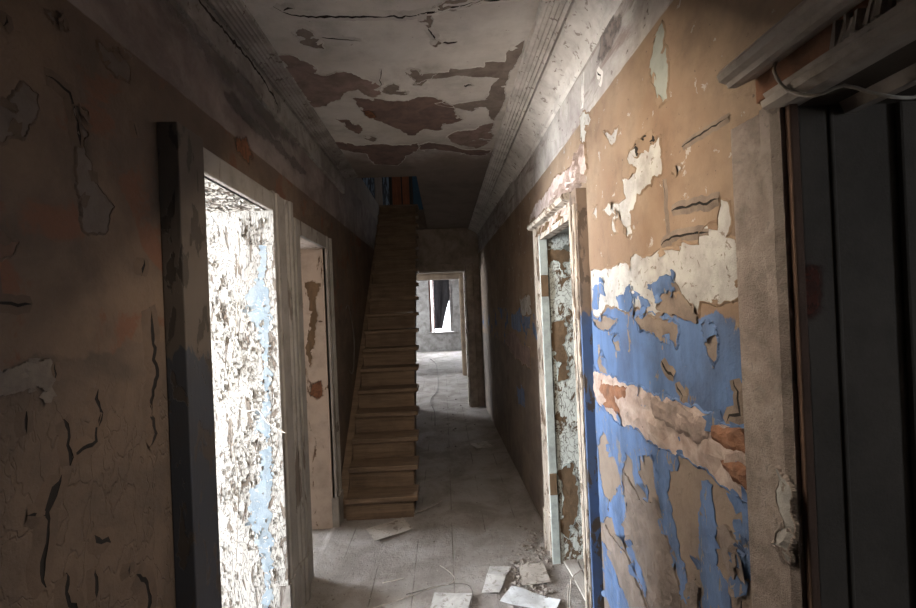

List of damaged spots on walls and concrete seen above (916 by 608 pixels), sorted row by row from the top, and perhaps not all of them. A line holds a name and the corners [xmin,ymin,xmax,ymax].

peeling [290,27,326,50]
crack [270,0,523,46]
peeling [278,39,525,166]
spalling [529,109,592,223]
peeling [603,125,620,147]
peeling [592,129,683,239]
peeling [547,244,570,278]
peeling [590,197,738,369]
peeling [205,182,281,608]
peeling [551,317,571,383]
peeling [557,460,580,539]
flaking render [593,349,750,608]